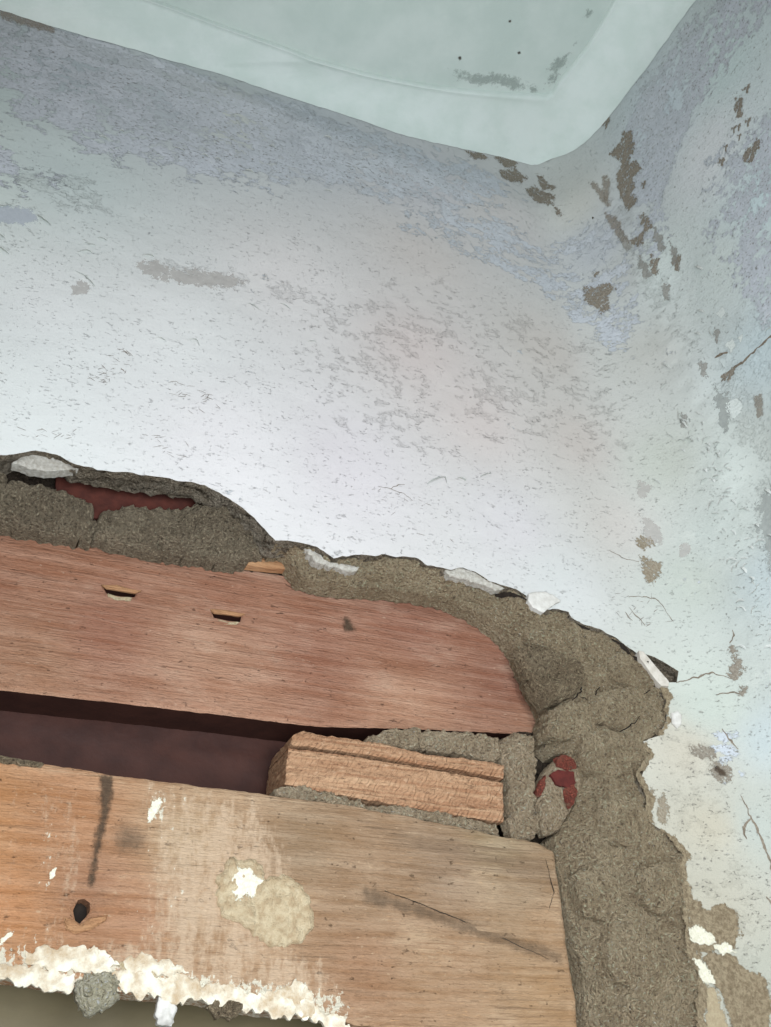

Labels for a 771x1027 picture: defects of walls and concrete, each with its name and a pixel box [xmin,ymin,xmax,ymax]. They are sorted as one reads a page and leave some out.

spalling [465,150,564,217]
spalling [588,130,681,302]
spalling [582,271,617,315]
crack [715,335,771,383]
peeling [666,361,732,482]
spalling [754,394,763,418]
peeling [10,455,78,478]
spalling [611,514,663,583]
peeling [708,485,771,648]
spalling [265,543,771,1027]